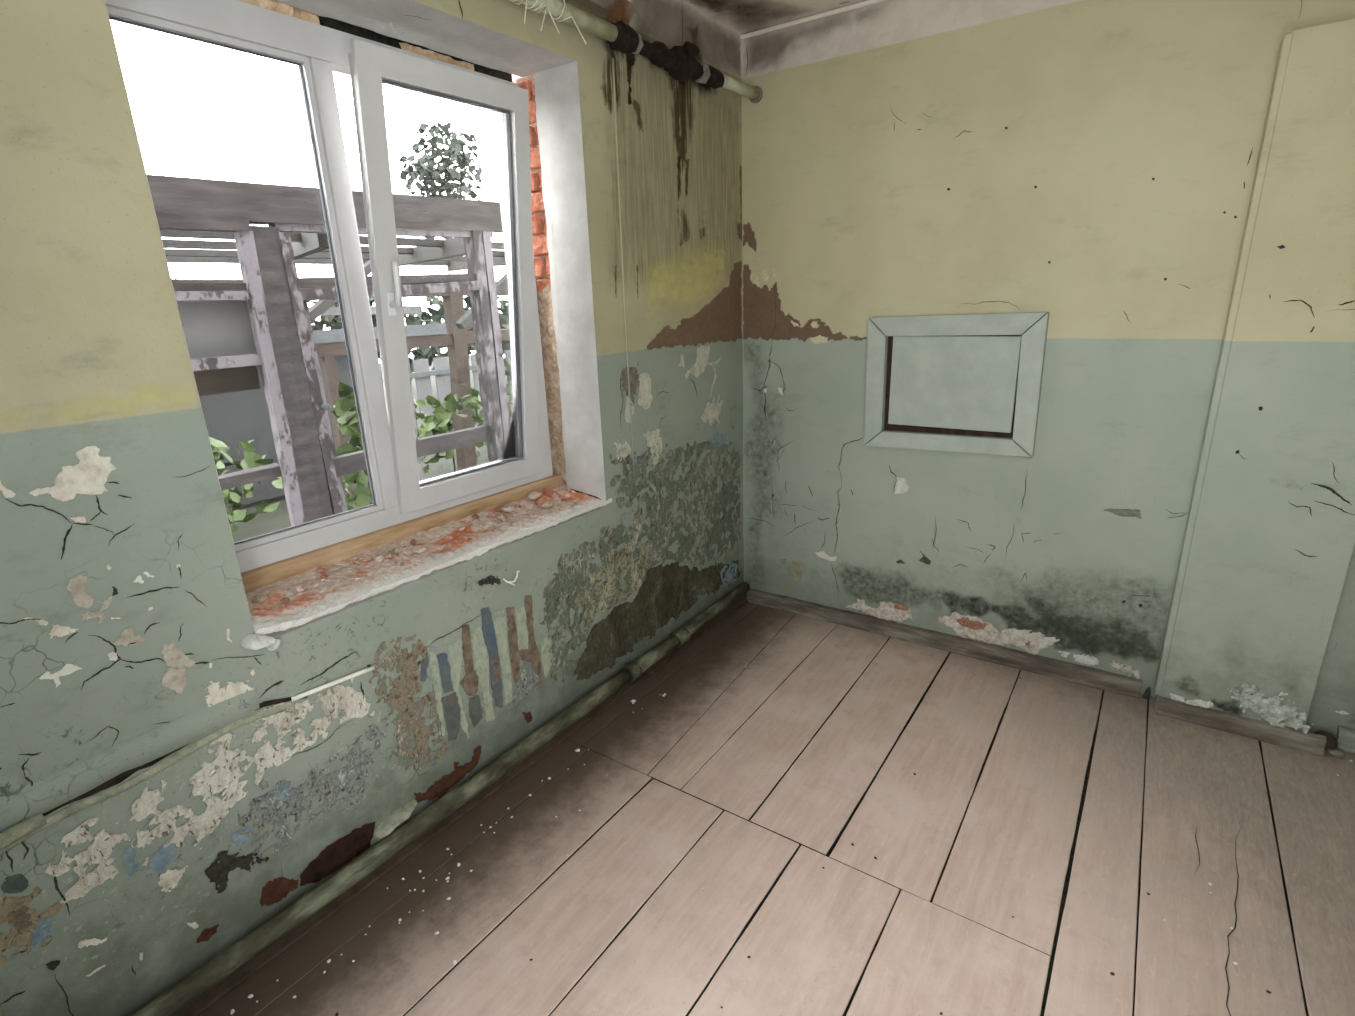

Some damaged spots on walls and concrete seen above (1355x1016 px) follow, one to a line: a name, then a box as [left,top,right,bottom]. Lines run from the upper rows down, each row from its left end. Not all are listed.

damp [706,0,789,24]
damp [603,51,642,128]
damp [671,78,693,199]
peeling [275,0,742,715]
peeling [0,446,120,521]
crack [6,495,134,559]
crack [0,534,205,690]
flaking render [846,599,912,623]
damp [841,568,1158,660]
crack [215,629,356,699]
peeling [0,623,448,1016]
crack [1225,828,1241,1016]